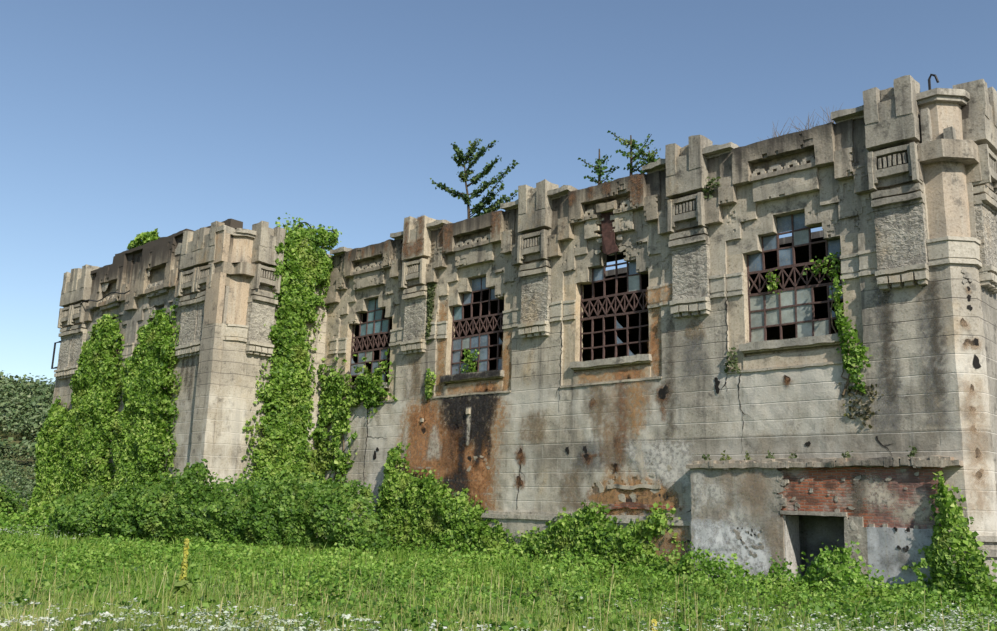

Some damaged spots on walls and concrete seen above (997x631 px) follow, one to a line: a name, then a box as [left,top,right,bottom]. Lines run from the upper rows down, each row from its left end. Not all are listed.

rust [398,333,512,509]
rust [580,284,673,473]
crack [721,300,748,453]
water stain [877,292,899,429]
water stain [923,282,948,426]
peeling [589,440,772,578]
spalling [827,469,932,576]